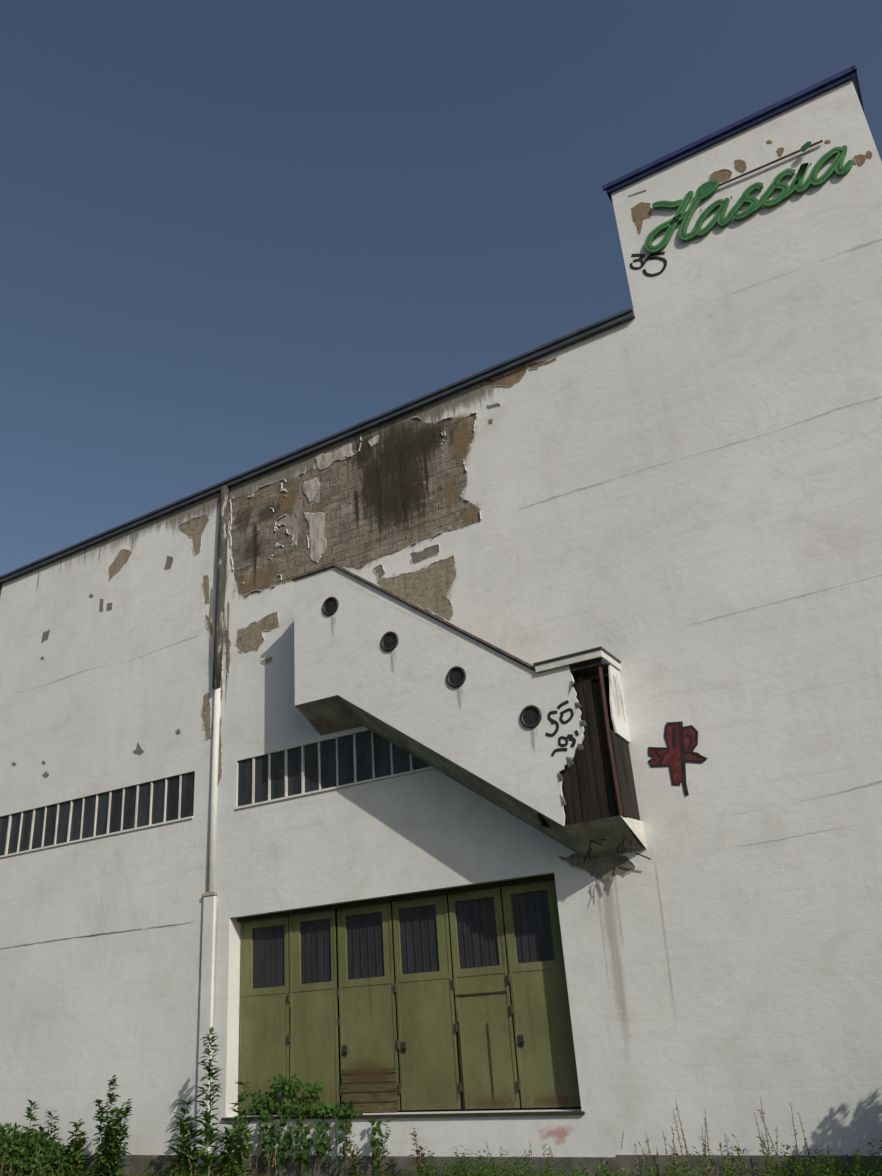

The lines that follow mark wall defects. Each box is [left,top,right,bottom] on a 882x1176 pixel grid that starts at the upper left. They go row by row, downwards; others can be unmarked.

peeling [709,159,747,182]
peeling [853,151,872,166]
peeling [628,190,652,233]
peeling [485,357,557,387]
damp [84,378,499,594]
peeling [229,403,500,621]
peeling [178,514,209,555]
peeling [108,549,132,581]
damp [209,588,229,700]
peeling [201,575,280,785]